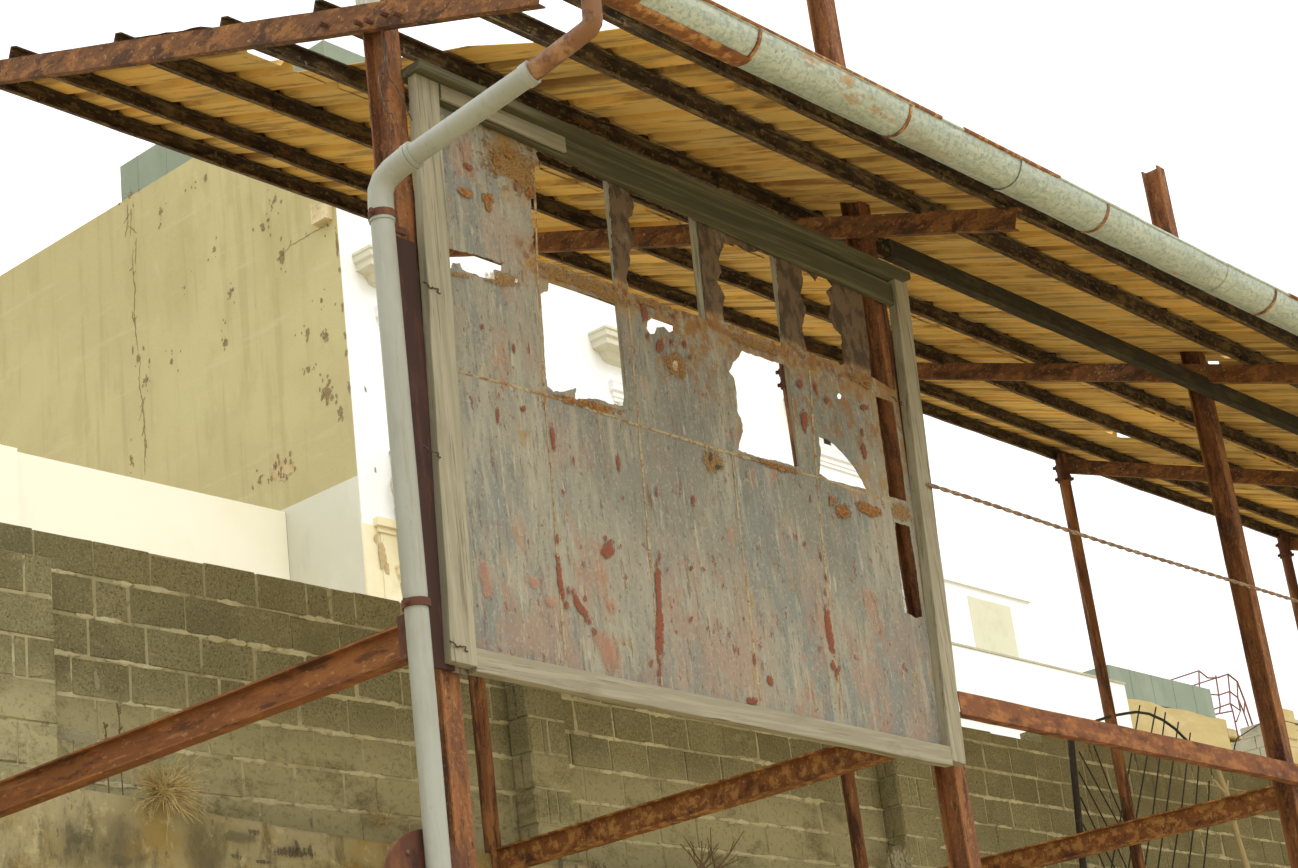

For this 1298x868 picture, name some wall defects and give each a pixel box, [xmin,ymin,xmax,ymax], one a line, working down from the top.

rust [530,261,666,309]
crack [124,205,147,471]
peeling [641,303,692,360]
rust [664,352,689,379]
rust [553,394,625,415]
rust [703,449,726,473]
rust [751,457,798,474]
rust [829,496,912,521]
peeling [601,535,622,559]
peeling [556,533,597,634]
peeling [651,549,668,683]
peeling [804,541,841,678]